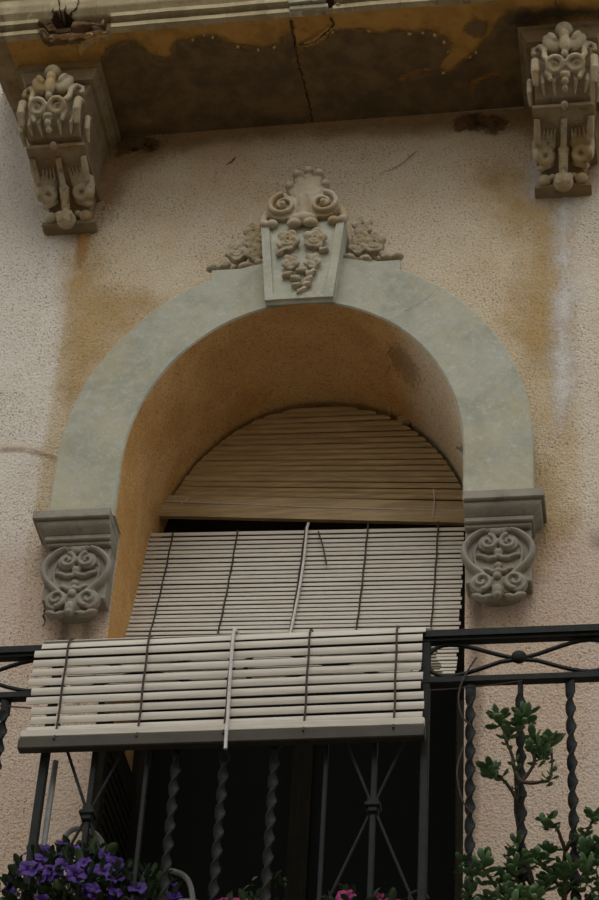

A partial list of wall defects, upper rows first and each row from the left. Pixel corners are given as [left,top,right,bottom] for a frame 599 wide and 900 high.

spalling [37,0,111,47]
crack [289,17,335,123]
peeling [101,8,535,156]
damp [95,108,534,214]